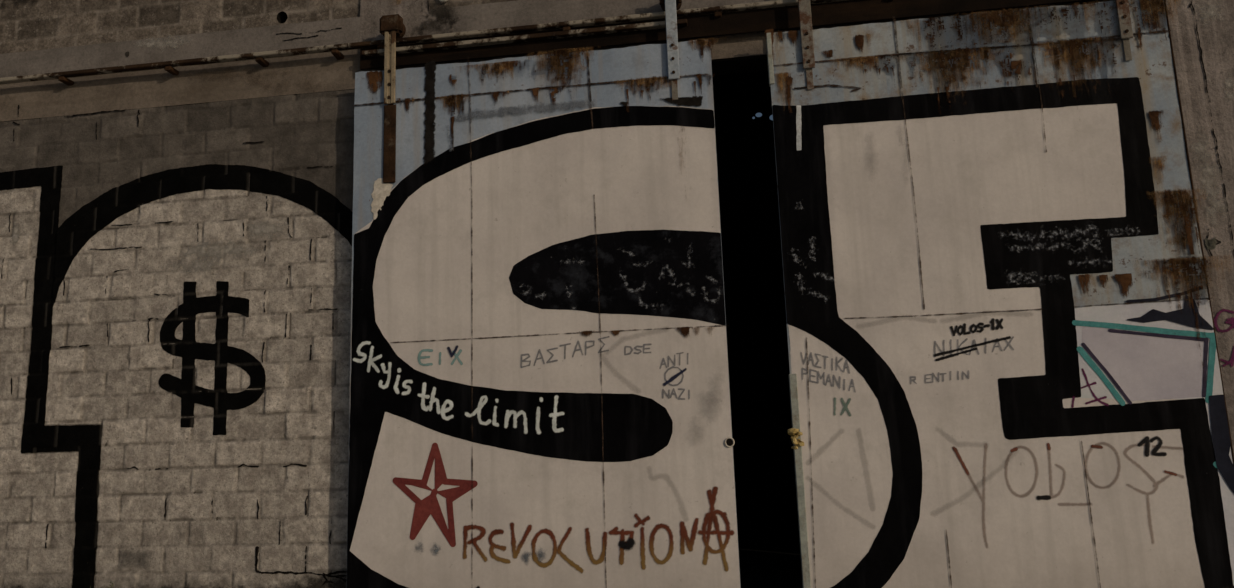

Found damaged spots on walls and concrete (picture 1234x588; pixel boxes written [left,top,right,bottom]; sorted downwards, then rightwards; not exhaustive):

rust [1131,0,1178,49]
rust [690,38,714,59]
rust [823,2,1125,114]
rust [367,71,383,99]
rust [443,47,592,141]
rust [618,76,671,108]
rust [775,72,793,112]
rust [1148,111,1164,132]
crack [1189,2,1234,256]
rust [1078,273,1133,297]
rust [1144,189,1230,345]